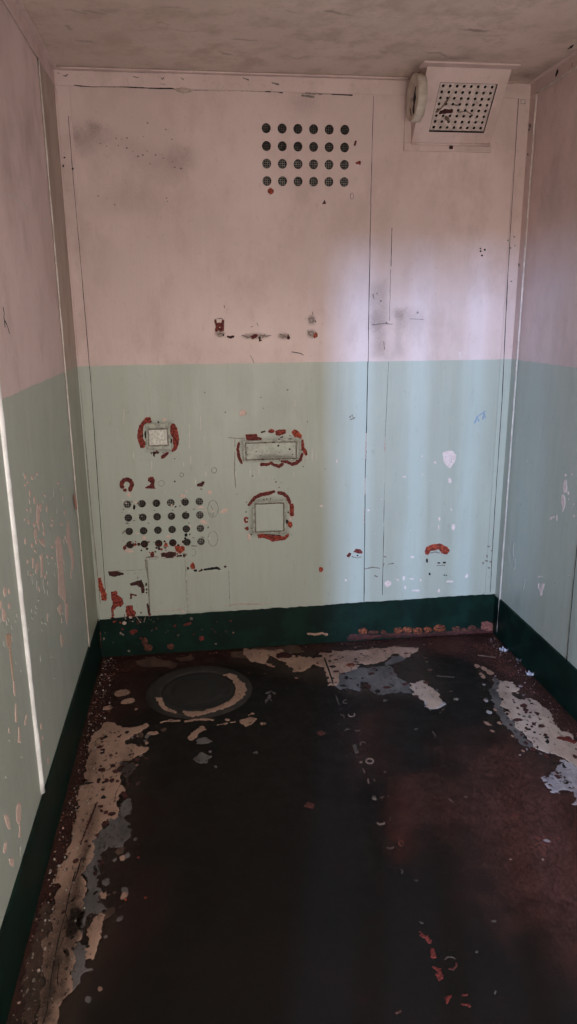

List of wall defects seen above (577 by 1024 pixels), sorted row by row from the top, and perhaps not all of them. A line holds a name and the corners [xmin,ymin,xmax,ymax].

peeling [0,472,77,758]
peeling [21,621,493,1024]
corrosion [419,931,444,981]
peeling [474,655,577,805]